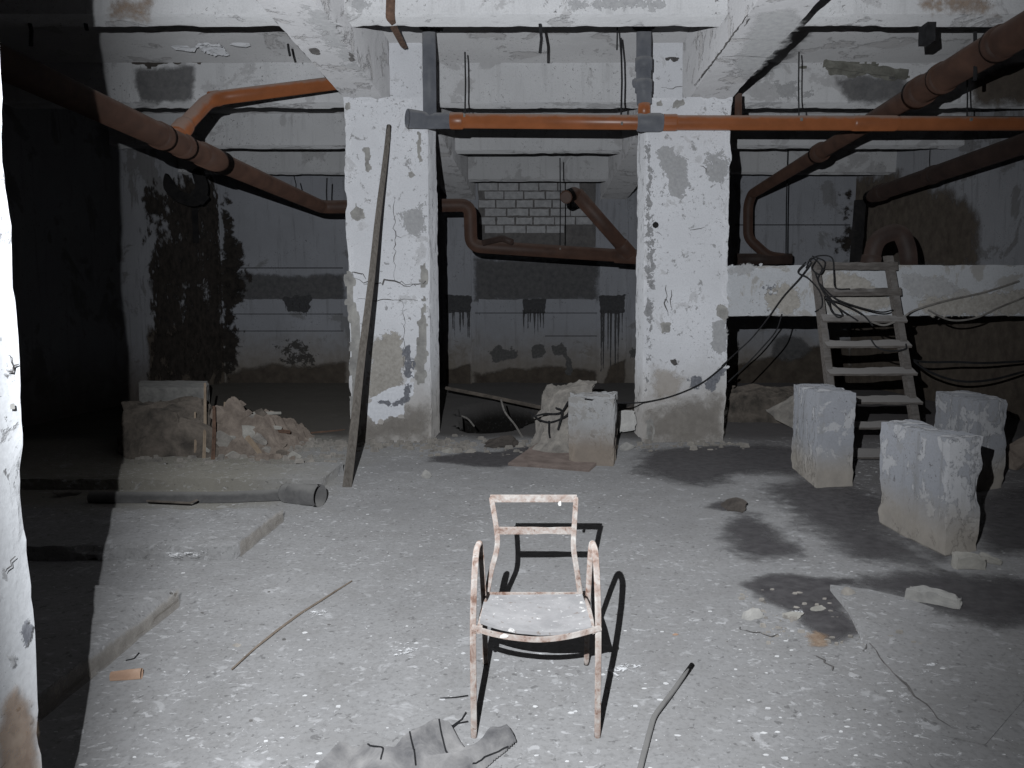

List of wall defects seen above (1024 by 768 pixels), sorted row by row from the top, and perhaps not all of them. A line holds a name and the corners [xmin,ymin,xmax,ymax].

peeling [127,42,251,69]
crack [662,14,766,89]
damp [838,76,907,102]
peeling [703,149,730,189]
damp [141,174,346,385]
crack [352,198,426,371]
damp [448,258,599,338]
peeling [344,263,429,438]
damp [447,311,625,384]
crack [862,643,950,726]